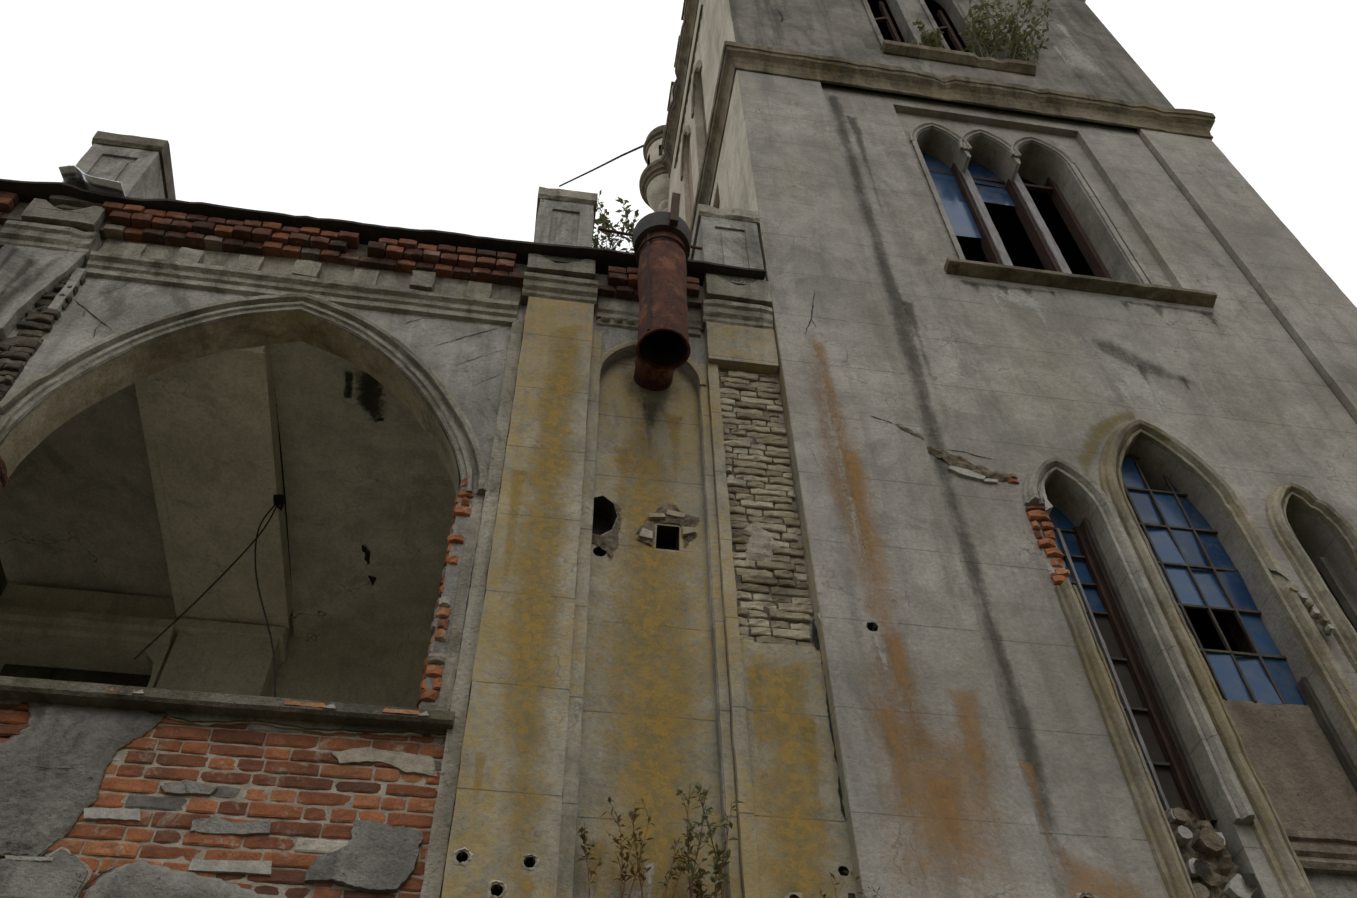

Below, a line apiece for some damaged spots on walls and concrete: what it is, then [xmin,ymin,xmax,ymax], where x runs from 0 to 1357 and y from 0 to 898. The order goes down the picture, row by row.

spalling [0,274,86,401]
spalling [872,416,1020,484]
spalling [362,545,376,586]
spalling [383,478,474,716]
spalling [592,496,621,559]
spalling [636,504,699,550]
spalling [718,370,821,649]
spalling [1025,483,1070,586]
spalling [0,703,29,743]
spalling [284,700,336,710]
spalling [0,717,446,898]
spalling [1164,807,1260,898]